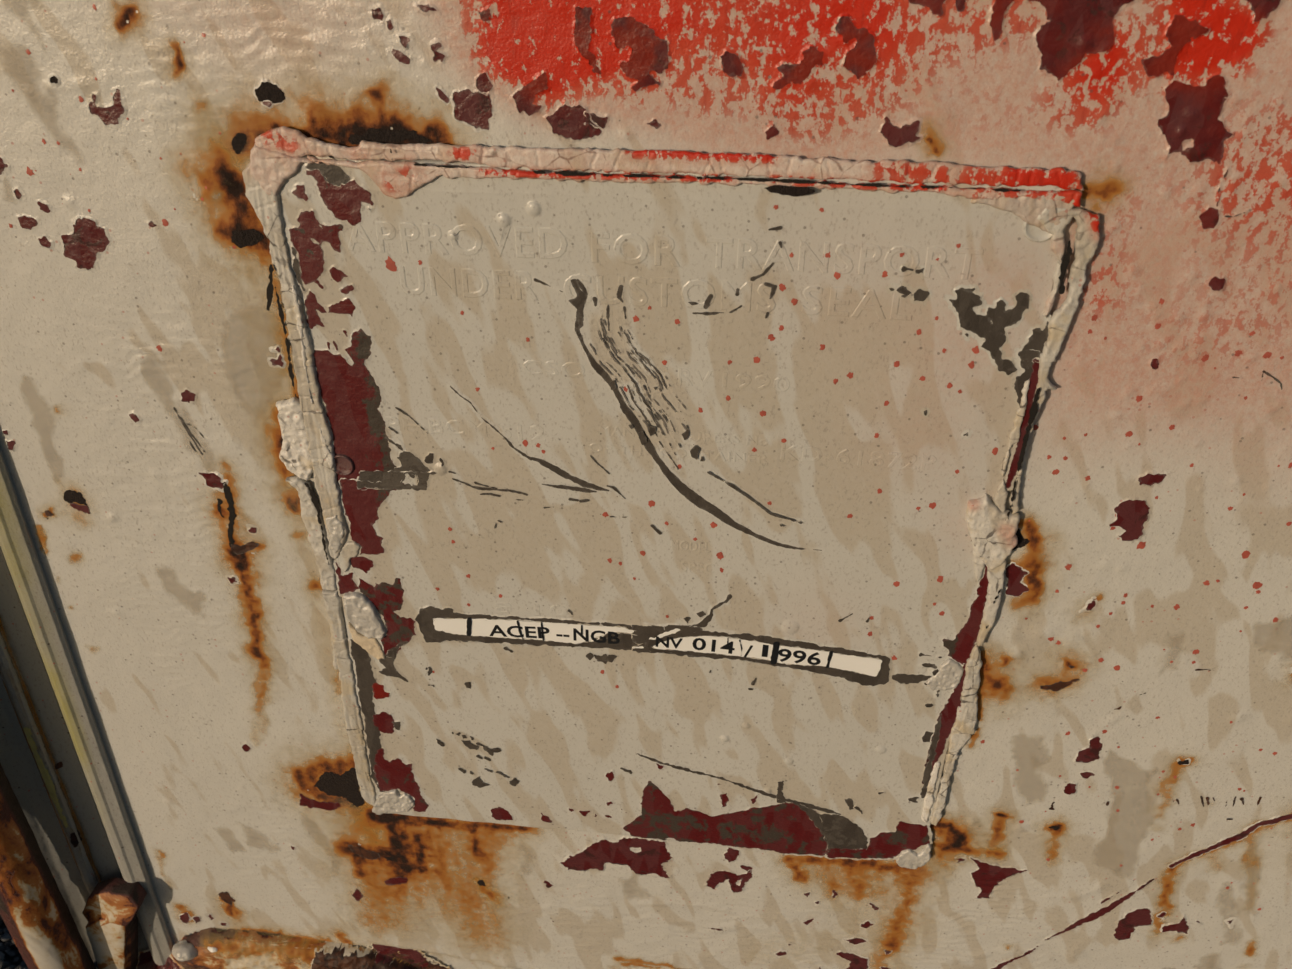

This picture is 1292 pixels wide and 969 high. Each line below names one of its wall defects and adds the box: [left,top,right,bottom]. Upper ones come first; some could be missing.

peeling [0,155,114,273]
rust [180,79,460,399]
peeling [367,0,612,144]
peeling [985,0,1143,84]
peeling [1136,6,1250,232]
rust [211,462,271,712]
rust [264,405,301,516]
peeling [285,156,1051,815]
rust [1007,517,1049,610]
rust [0,763,98,969]
rust [285,753,539,944]
peeling [538,762,933,894]